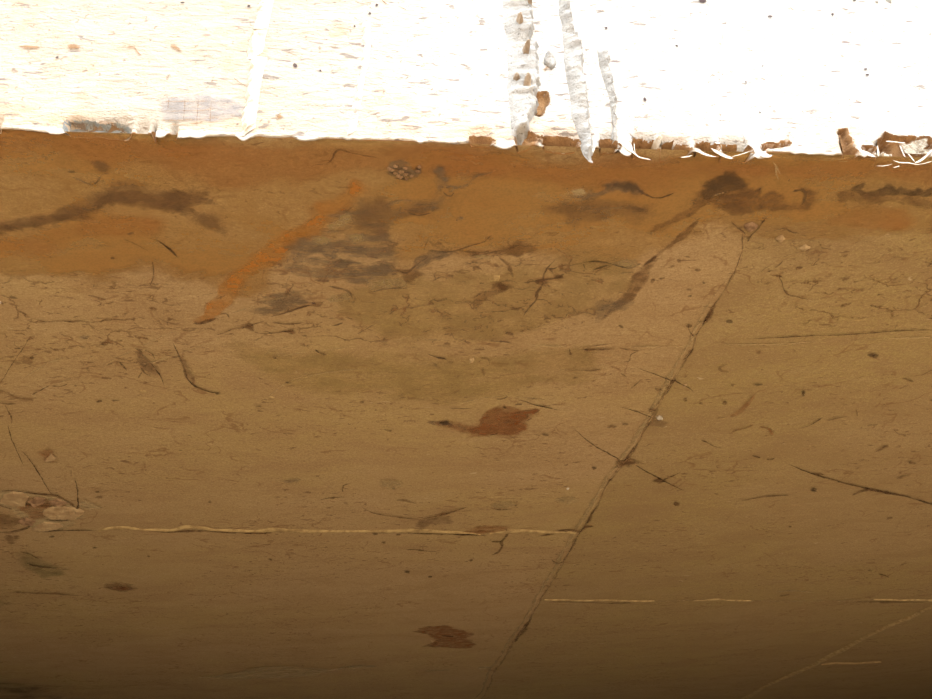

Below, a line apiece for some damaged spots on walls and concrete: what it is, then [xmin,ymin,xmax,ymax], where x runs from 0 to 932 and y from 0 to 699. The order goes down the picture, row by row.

spalling [534,91,551,117]
spalling [515,131,582,150]
spalling [599,135,799,161]
spalling [838,128,932,168]
leakage [0,130,328,297]
leakage [342,146,932,282]
crack [218,237,640,360]
leakage [597,256,656,311]
corrosion [469,396,538,435]
crack [572,306,715,491]
crack [754,456,932,505]
crack [496,505,598,668]